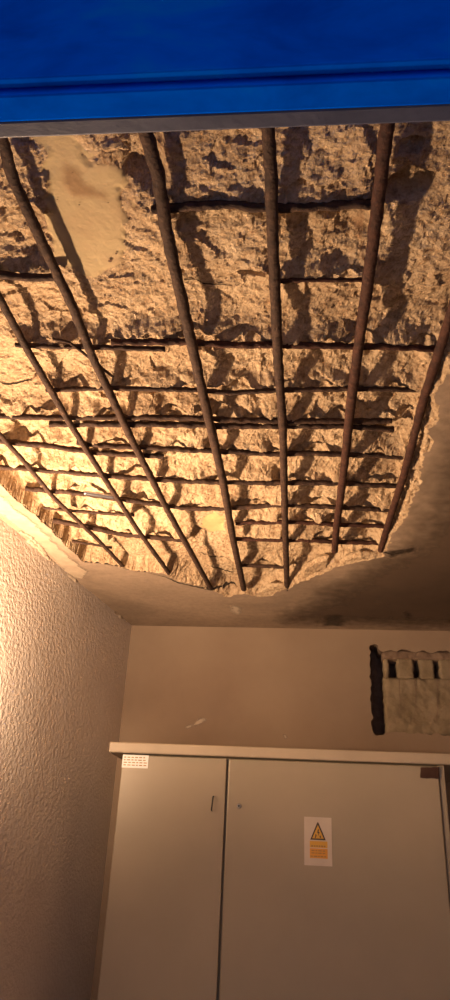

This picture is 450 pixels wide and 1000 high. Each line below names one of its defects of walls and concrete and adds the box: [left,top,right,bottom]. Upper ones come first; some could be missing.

spalling [0,121,450,597]